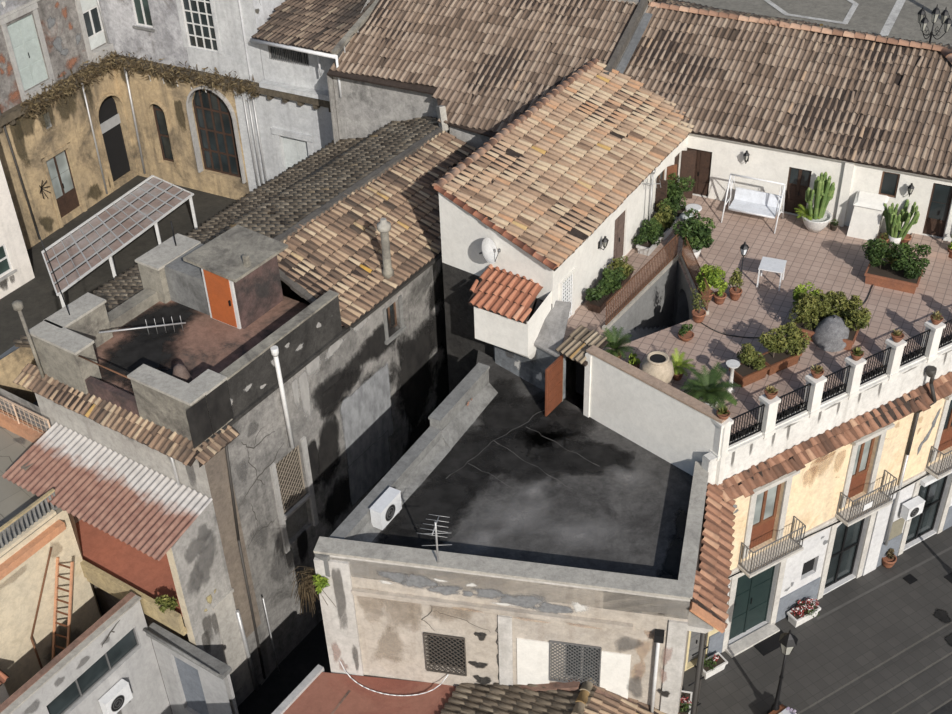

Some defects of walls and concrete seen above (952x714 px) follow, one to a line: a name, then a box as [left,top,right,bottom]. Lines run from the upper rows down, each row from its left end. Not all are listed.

water stain [291,266,449,526]
water stain [379,380,634,550]
crack [446,410,600,489]
water stain [186,525,214,590]
water stain [272,530,308,579]
flaking render [377,571,587,614]